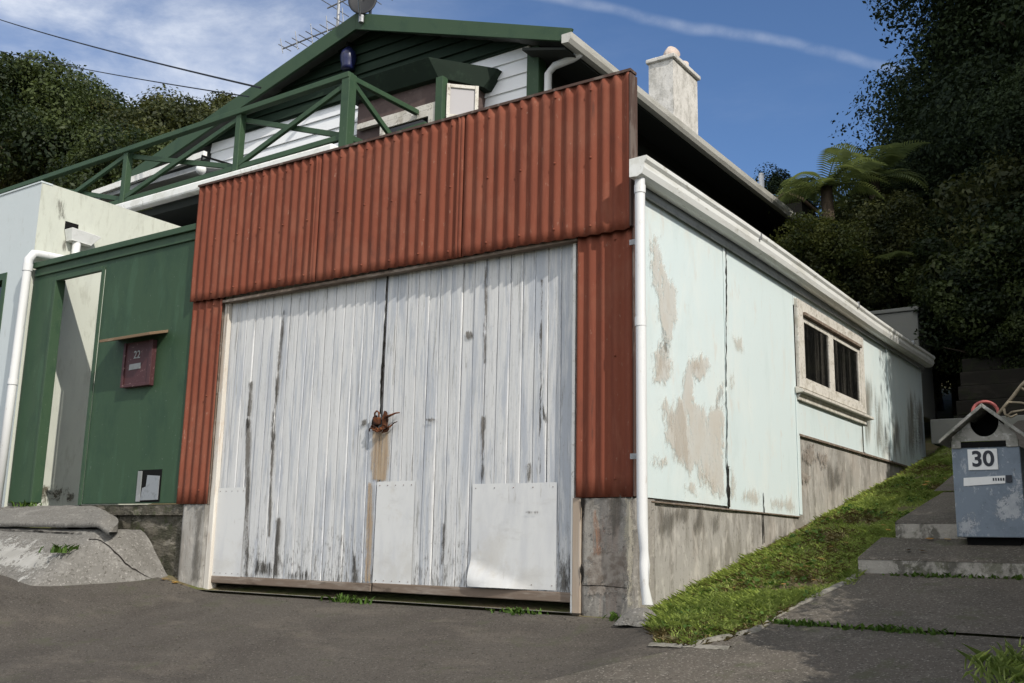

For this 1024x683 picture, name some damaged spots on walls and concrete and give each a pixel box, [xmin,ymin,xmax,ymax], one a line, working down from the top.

peeling [649,236,725,499]
water stain [660,507,719,533]
crack [0,529,150,578]
water stain [255,559,272,578]
water stain [337,537,359,583]